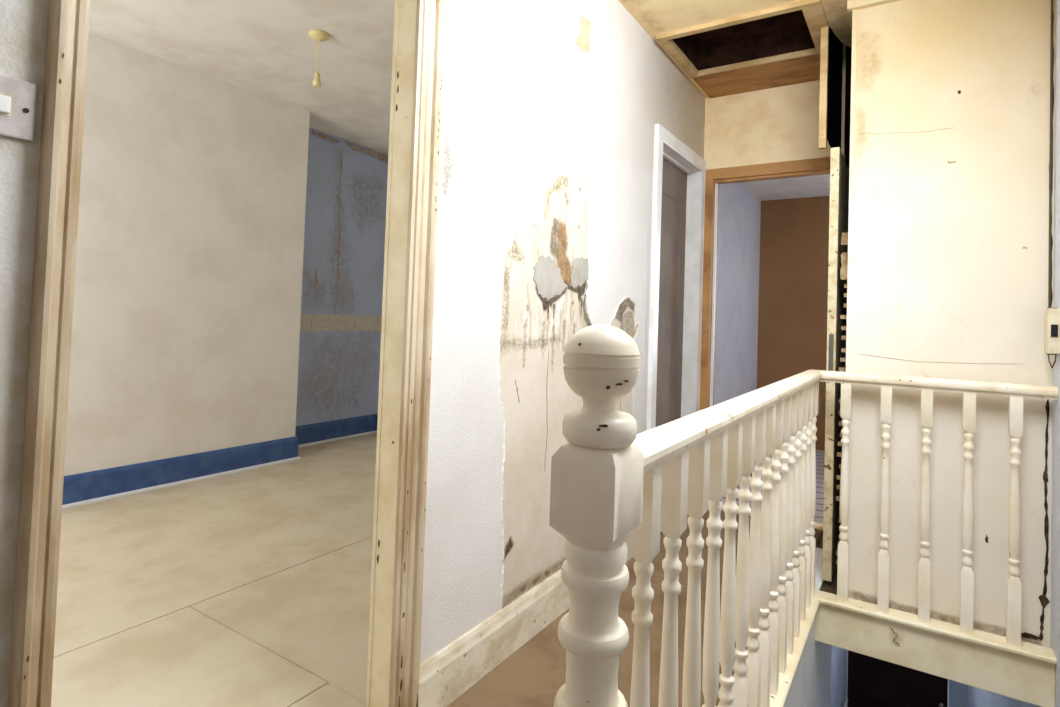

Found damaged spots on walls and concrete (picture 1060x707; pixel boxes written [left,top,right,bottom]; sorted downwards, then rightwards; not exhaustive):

crack [1048,12,1056,189]
flaking render [499,43,591,608]
flaking render [606,380,633,416]
flaking render [610,297,639,339]
crack [1048,215,1056,307]
crack [1021,399,1050,641]